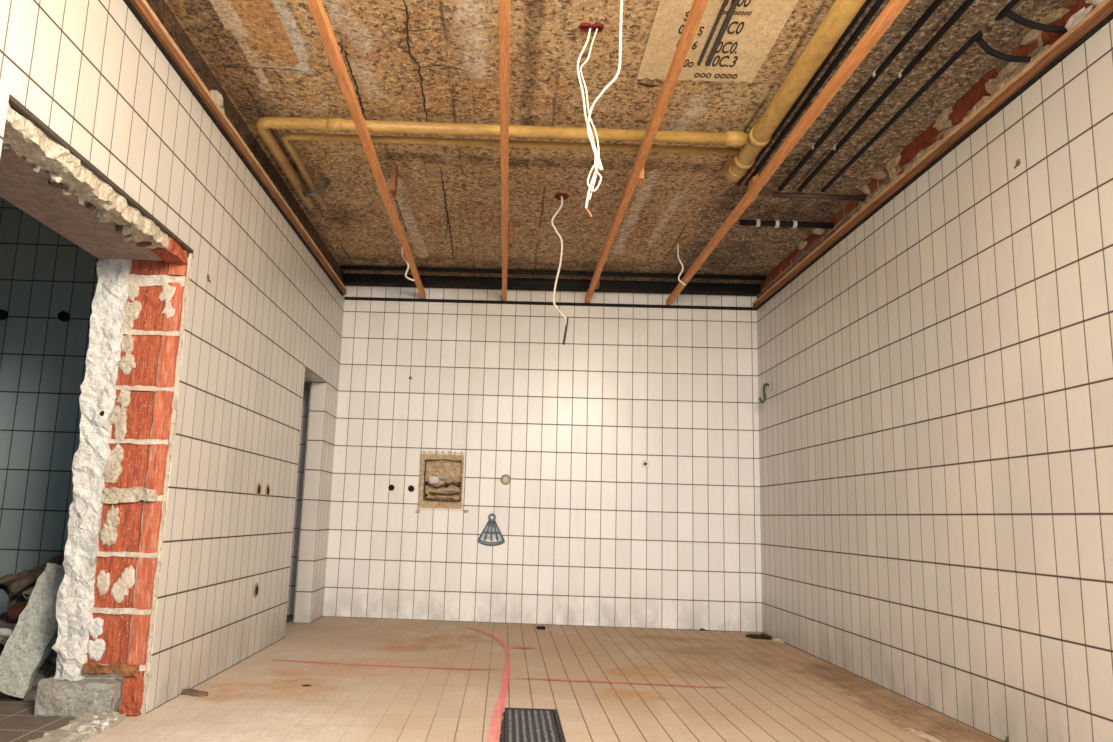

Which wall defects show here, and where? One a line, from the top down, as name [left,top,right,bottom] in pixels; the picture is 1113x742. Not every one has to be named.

flaking render [2,102,188,265]
flaking render [119,283,142,375]
flaking render [159,283,176,318]
flaking render [104,389,131,483]
spalling [28,712,125,742]
leakage [776,659,1000,742]